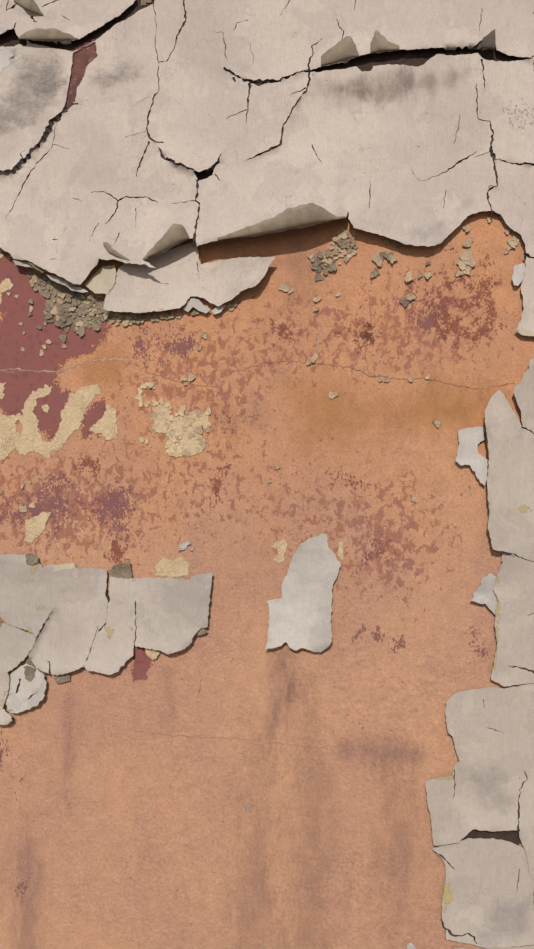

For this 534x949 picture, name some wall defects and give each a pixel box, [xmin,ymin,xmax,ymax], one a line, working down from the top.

peeling [14,0,43,15]
peeling [0,28,78,73]
crack [0,0,221,242]
peeling [321,30,400,66]
crack [213,0,534,216]
peeling [470,29,496,50]
peeling [0,223,276,457]
peeling [217,203,358,281]
peeling [344,238,402,360]
peeling [399,226,534,356]
peeling [0,453,213,768]
peeling [265,525,405,653]